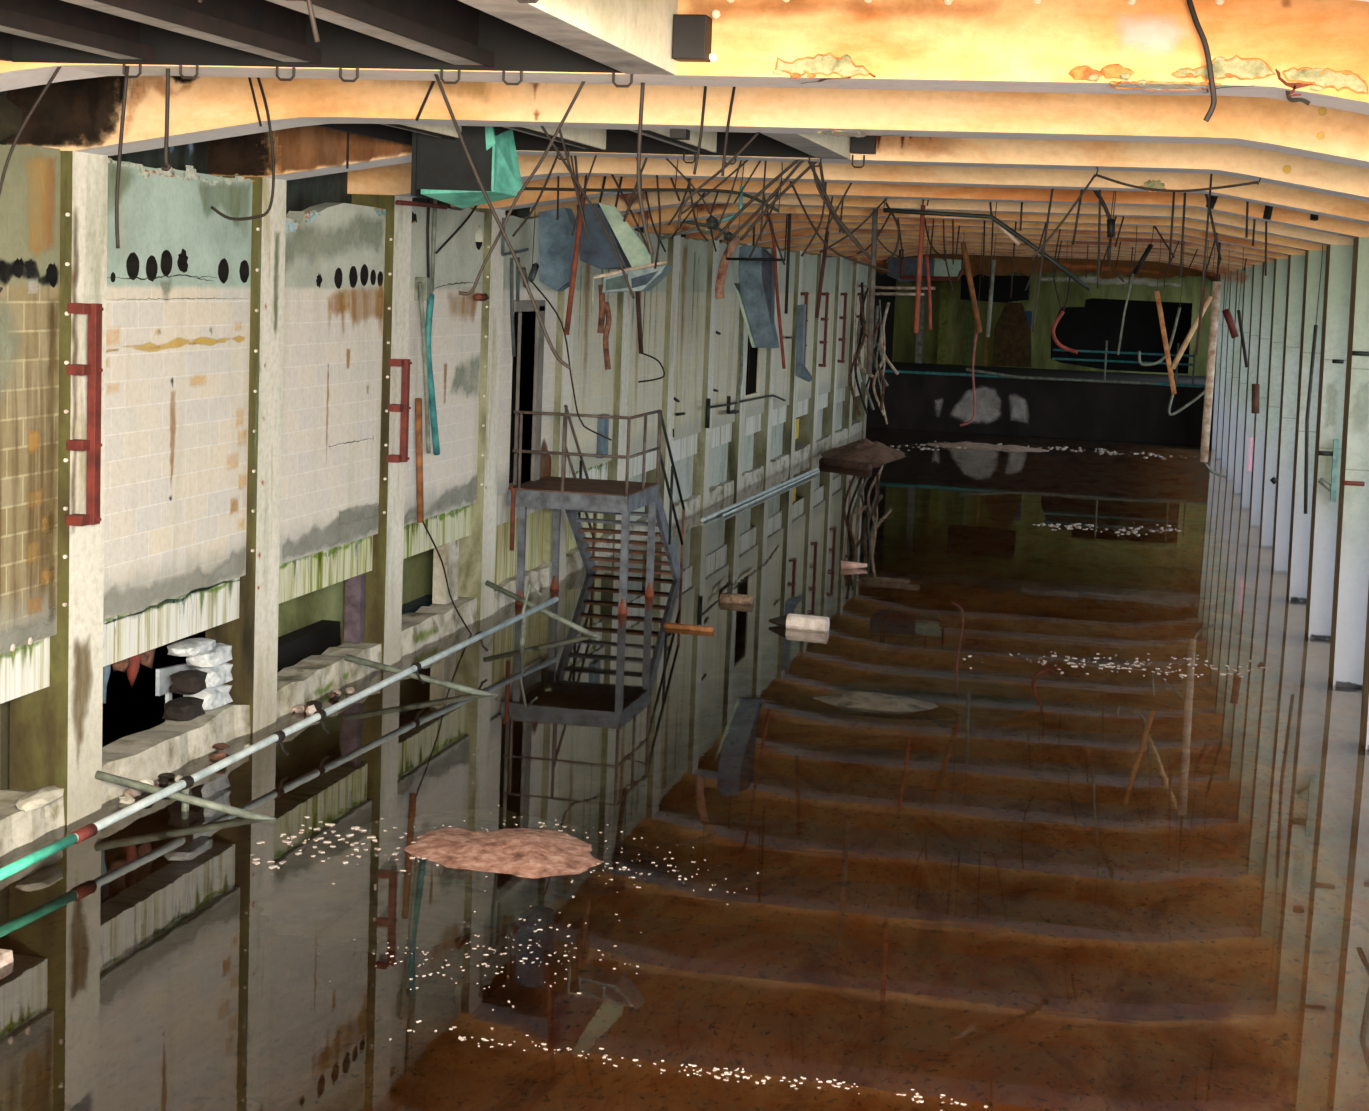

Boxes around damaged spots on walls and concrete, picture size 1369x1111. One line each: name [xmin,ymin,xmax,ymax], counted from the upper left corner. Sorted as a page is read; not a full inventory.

spalling [772,52,876,79]
spalling [1108,55,1369,105]
damp [7,76,124,251]
damp [108,167,129,200]
spalling [108,141,255,186]
spalling [286,172,352,233]
spalling [412,197,451,223]
rust [335,293,357,320]
damp [283,504,379,575]
damp [74,550,245,742]